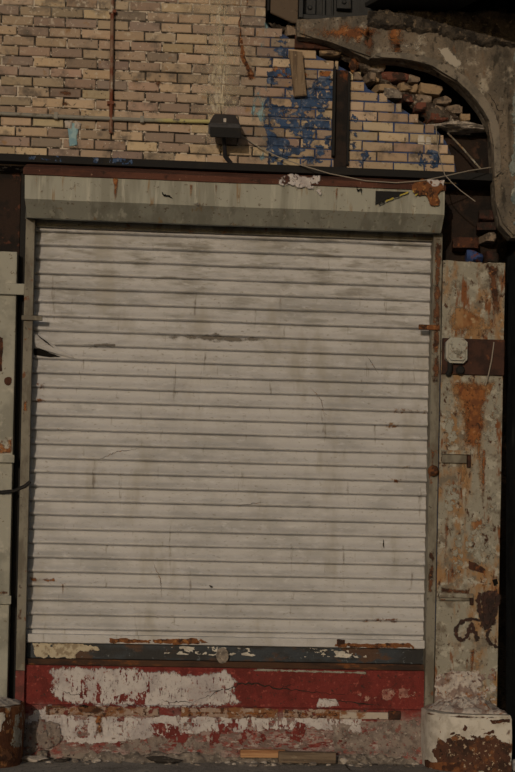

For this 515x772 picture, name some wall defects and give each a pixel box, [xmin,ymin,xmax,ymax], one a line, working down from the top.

peeling [367,8,515,62]
peeling [263,22,333,167]
spalling [319,50,460,124]
peeling [350,132,371,166]
peeling [418,149,440,168]
peeling [279,174,321,195]
corrosion [412,179,445,206]
corrosion [433,239,505,491]
peeling [10,643,415,748]
peeling [434,668,497,705]
corrosion [425,734,512,772]